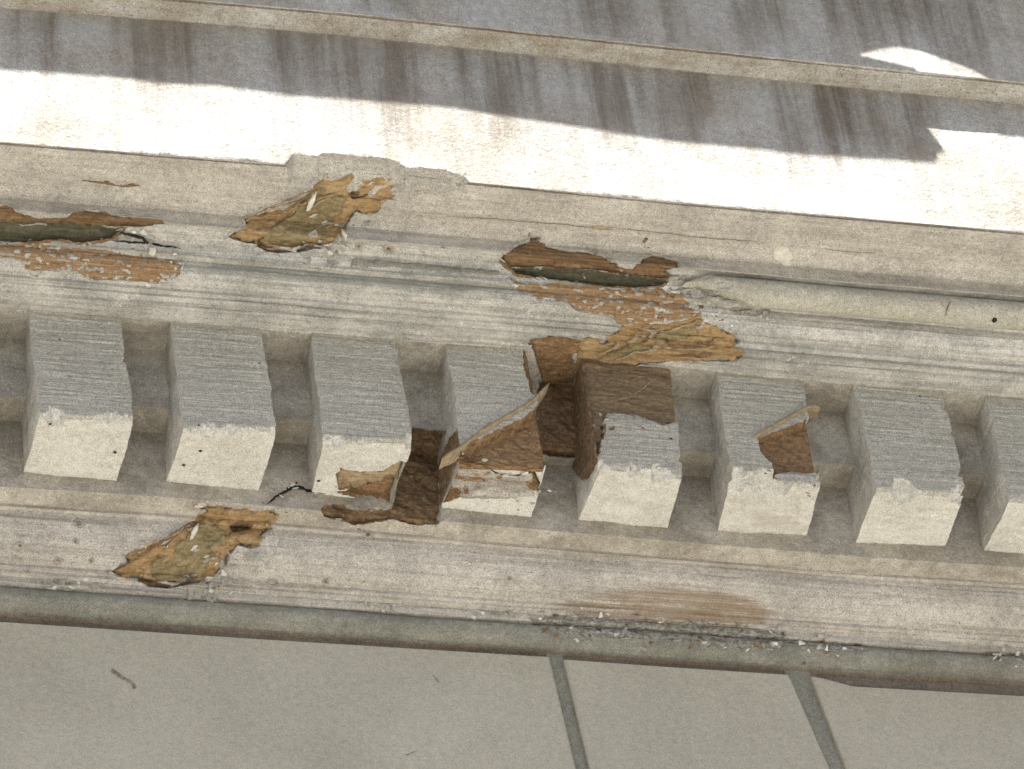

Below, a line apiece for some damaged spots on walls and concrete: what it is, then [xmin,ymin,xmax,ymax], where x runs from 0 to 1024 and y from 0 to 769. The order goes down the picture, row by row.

spalling [0,204,186,287]
spalling [226,153,469,272]
spalling [321,233,771,530]
crack [266,482,324,505]
spalling [752,405,820,500]
spalling [105,501,288,603]